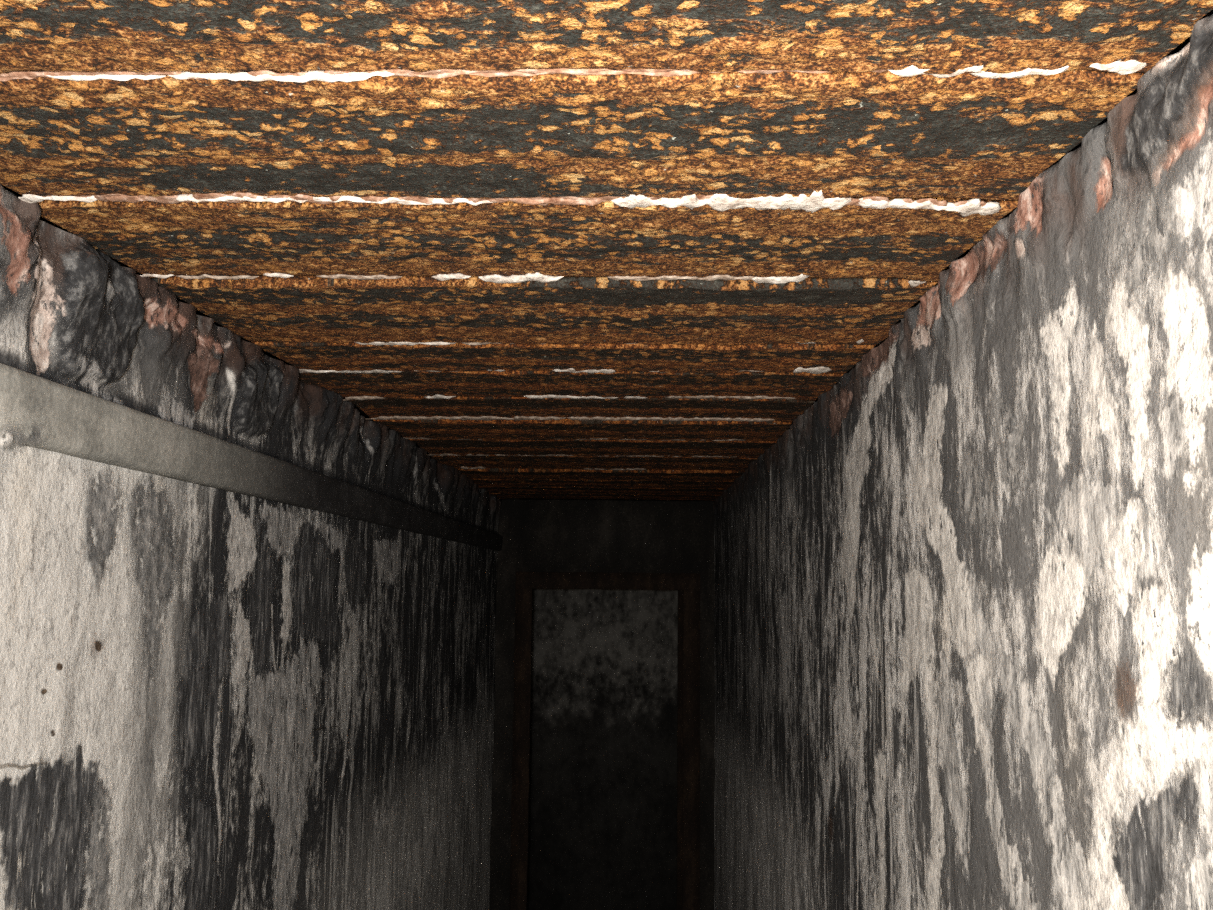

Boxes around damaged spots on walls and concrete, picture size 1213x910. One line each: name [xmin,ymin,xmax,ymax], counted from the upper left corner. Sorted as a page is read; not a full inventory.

leakage [0,68,829,83]
leakage [870,65,1069,79]
leakage [1089,60,1147,75]
leakage [18,190,1001,217]
leakage [432,272,563,283]
leakage [607,274,809,284]
leakage [86,471,182,676]
leakage [176,500,344,910]
crack [0,761,47,769]
leakage [902,675,946,910]
leakage [874,750,887,910]
leakage [83,788,112,910]